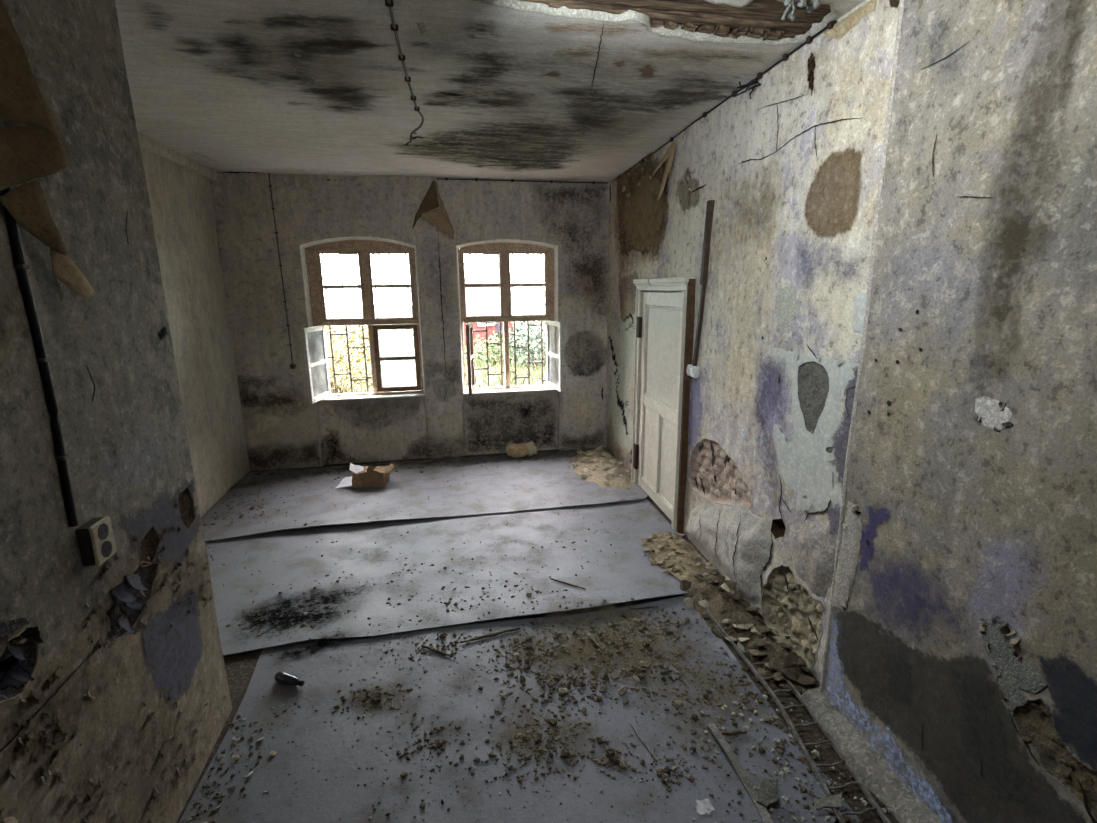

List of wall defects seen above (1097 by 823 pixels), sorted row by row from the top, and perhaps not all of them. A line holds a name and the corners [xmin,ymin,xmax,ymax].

water stain [226,37,377,110]
water stain [430,53,519,107]
water stain [397,79,727,170]
water stain [805,149,861,237]
water stain [411,398,602,455]
crack [601,313,635,465]
spalling [975,396,1013,432]
spalling [687,438,753,509]
peeling [760,346,862,672]
spalling [83,482,216,649]
water stain [826,609,1086,823]
spalling [979,616,1097,821]